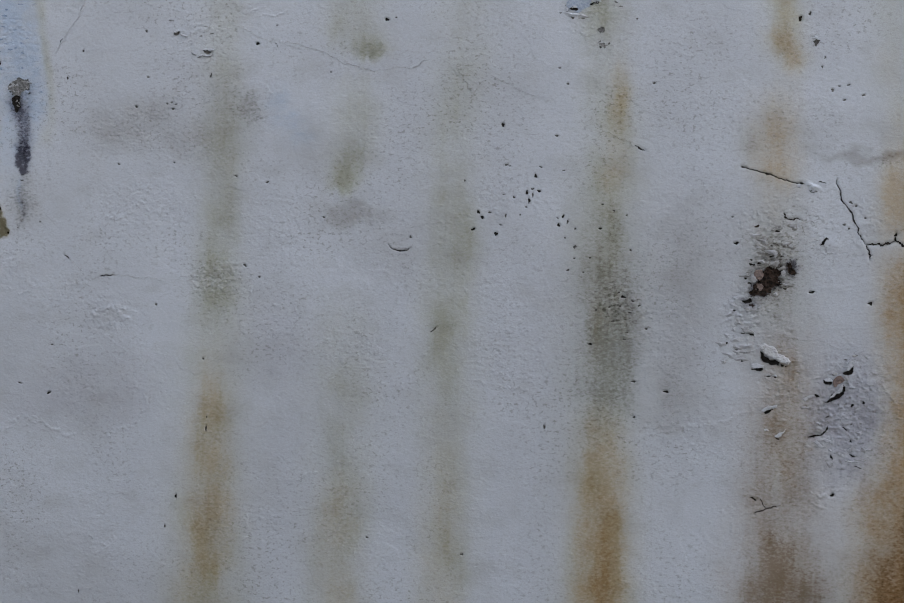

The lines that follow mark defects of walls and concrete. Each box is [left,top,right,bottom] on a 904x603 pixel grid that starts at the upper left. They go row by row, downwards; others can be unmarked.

peeling [559,0,603,19]
spalling [8,67,32,113]
leakage [11,101,30,175]
peeling [0,207,18,237]
crack [741,166,904,258]
spalling [715,224,798,378]
peeling [800,354,858,410]